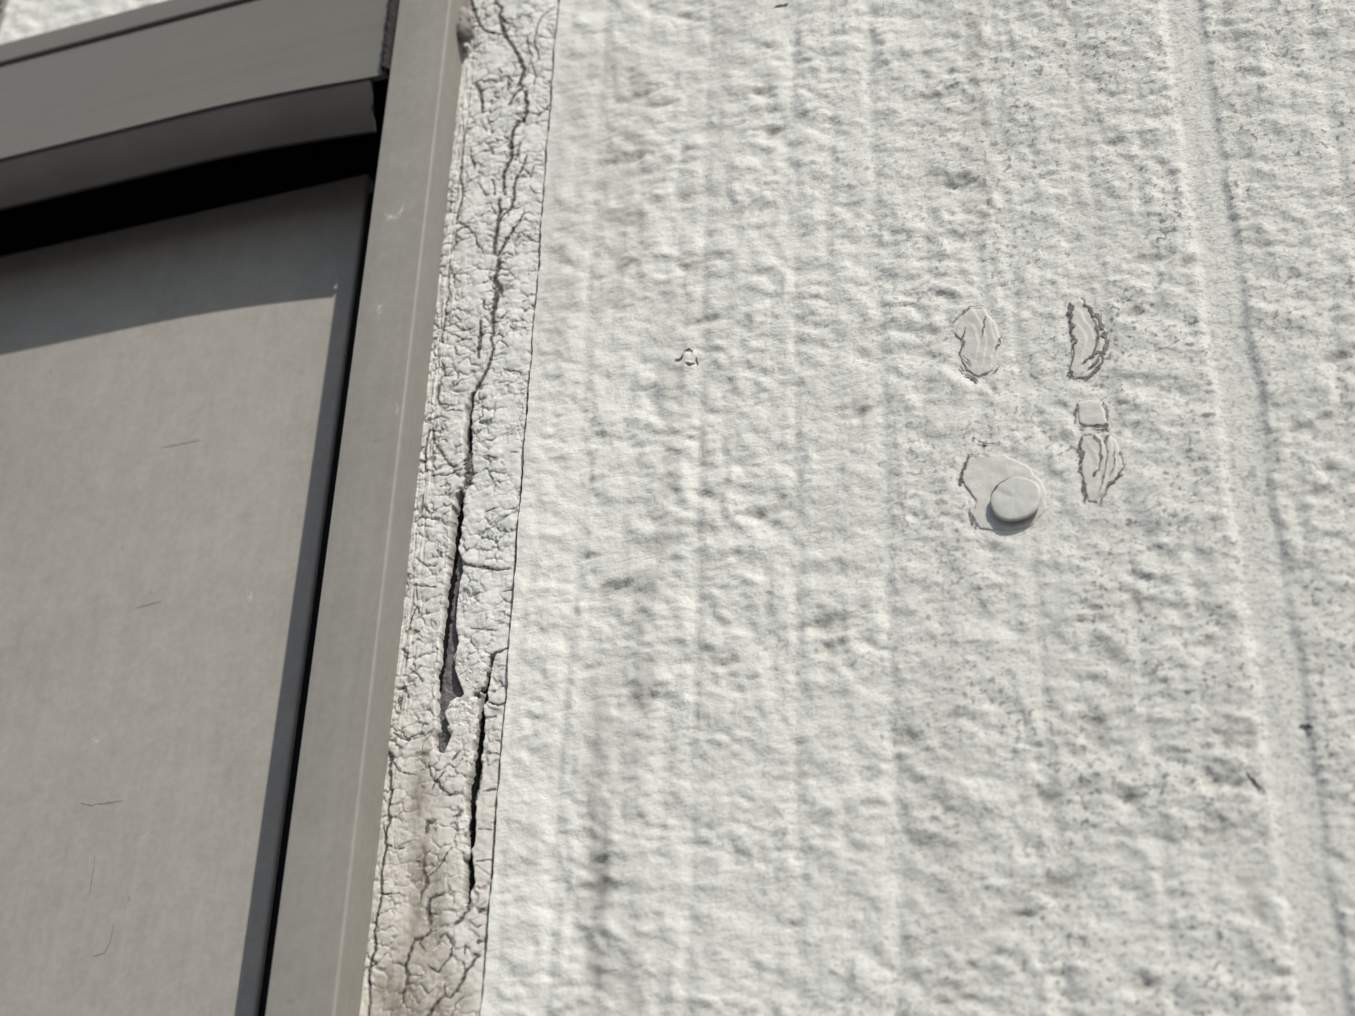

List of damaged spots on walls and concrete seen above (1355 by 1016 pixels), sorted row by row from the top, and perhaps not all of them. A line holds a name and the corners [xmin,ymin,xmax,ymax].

spalling [953,305,1002,382]
spalling [1066,298,1110,380]
crack [368,0,559,1016]
spalling [959,437,1047,532]
spalling [1074,400,1125,504]